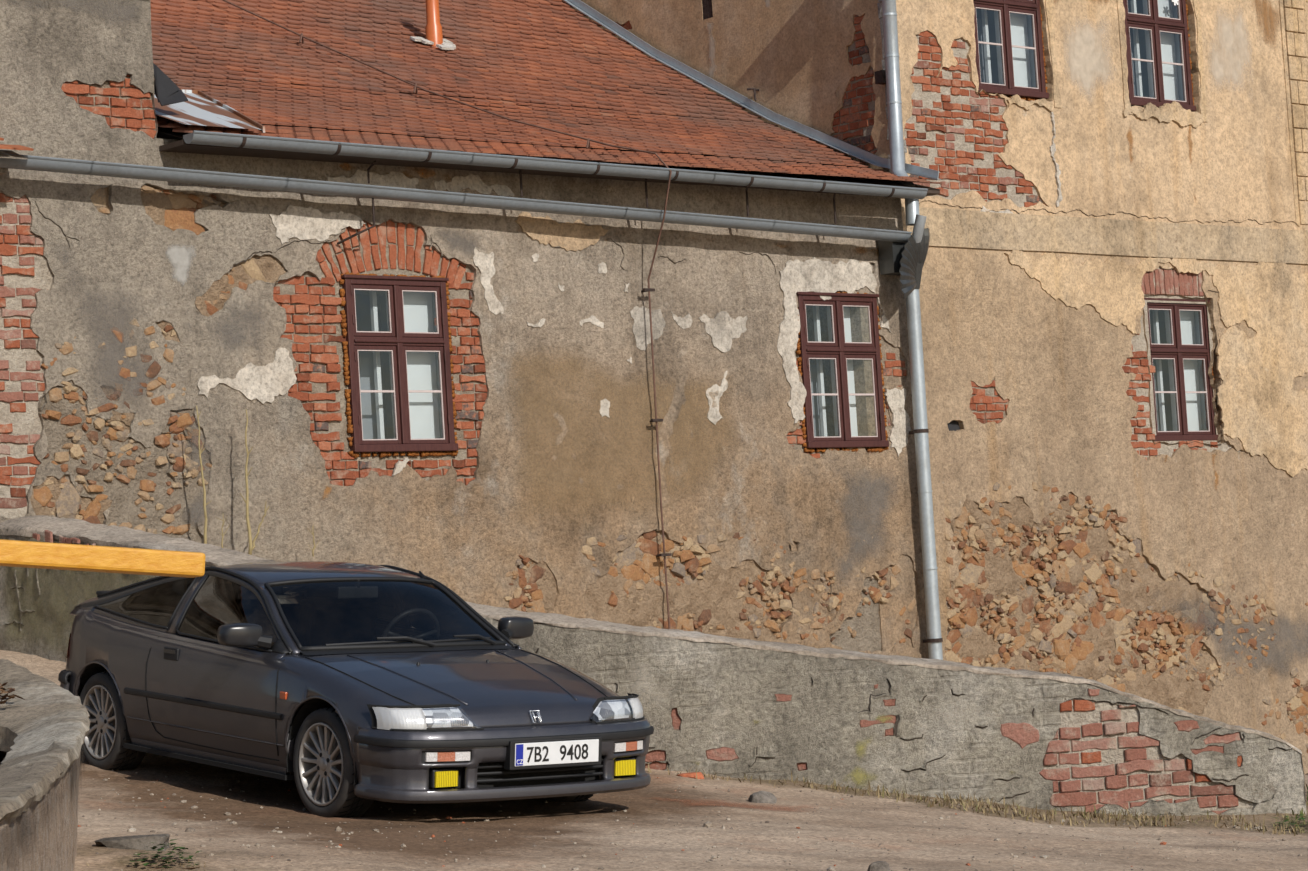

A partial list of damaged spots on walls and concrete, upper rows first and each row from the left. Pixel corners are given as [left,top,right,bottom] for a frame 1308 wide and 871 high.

flaking render [61,74,157,139]
flaking render [832,15,878,155]
flaking render [903,31,1063,214]
flaking render [141,184,235,235]
peeling [0,192,504,546]
peeling [624,283,748,364]
peeling [777,257,891,459]
peeling [883,353,911,457]
flaking render [969,378,1009,424]
peeling [1004,250,1308,477]
flaking render [581,526,916,652]
flaking render [944,482,1279,814]